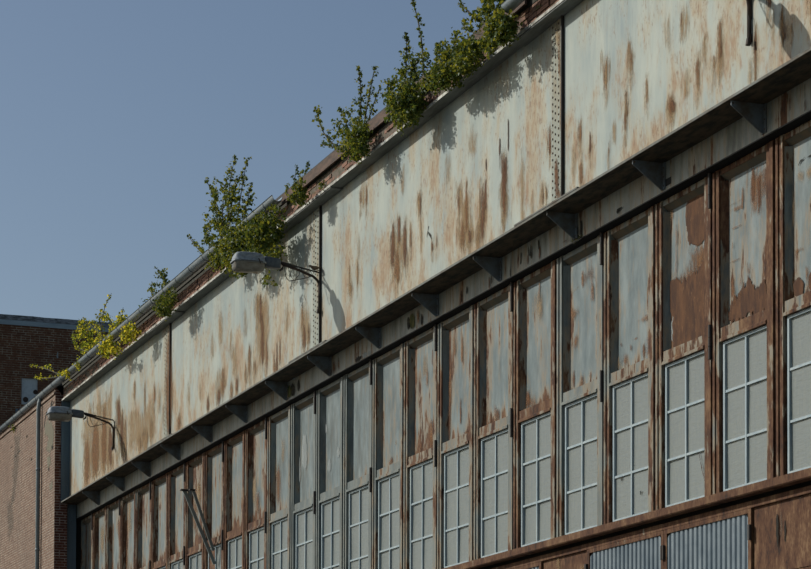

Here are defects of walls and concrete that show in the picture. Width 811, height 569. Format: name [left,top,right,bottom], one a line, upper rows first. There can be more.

corrosion [712,23,723,81]
corrosion [773,7,792,47]
corrosion [607,92,628,162]
corrosion [499,123,509,223]
corrosion [541,130,560,206]
corrosion [458,183,486,252]
corrosion [390,219,437,292]
corrosion [188,295,281,408]
corrosion [301,311,310,349]
corrosion [82,334,181,486]